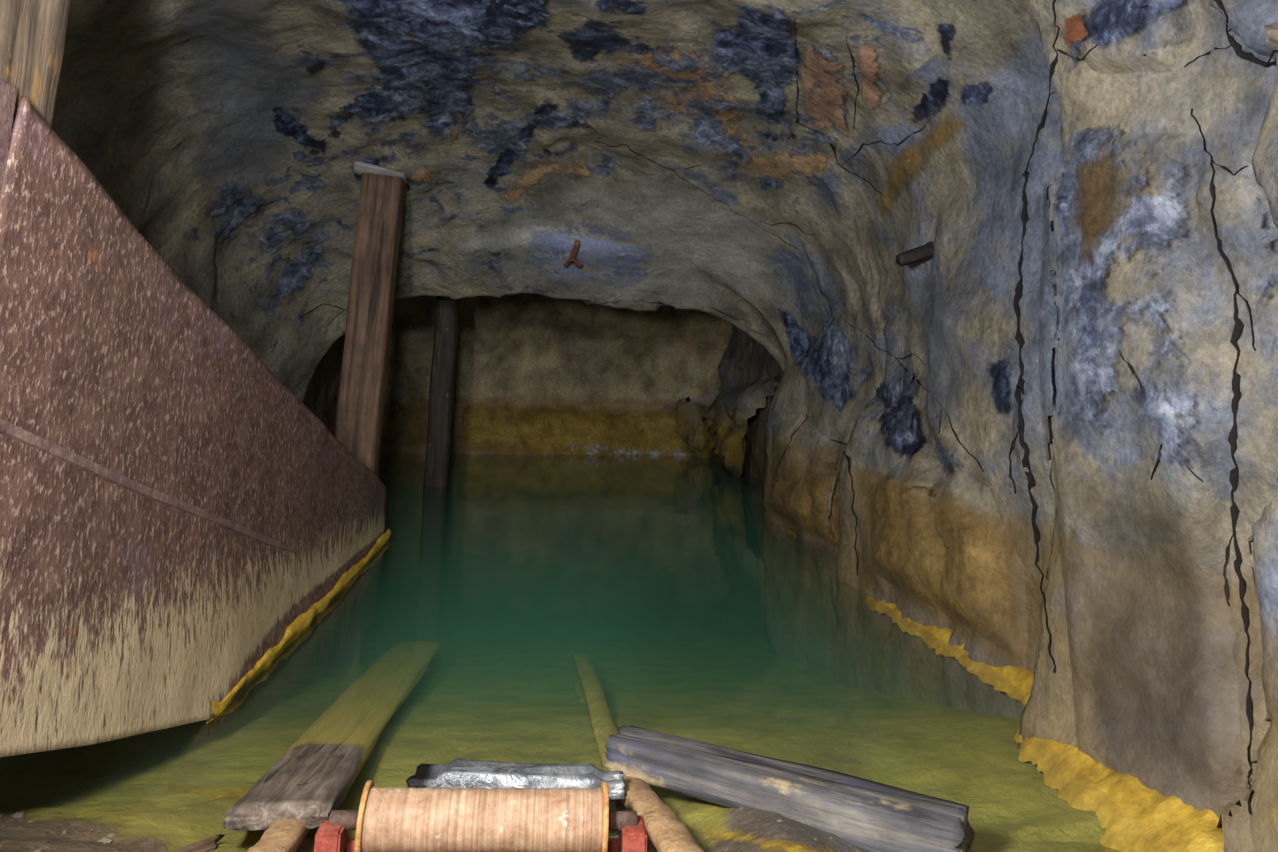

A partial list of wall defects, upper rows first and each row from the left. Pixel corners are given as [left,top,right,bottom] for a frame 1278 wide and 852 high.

crack [847,0,1098,673]
damp [1013,727,1224,852]
crack [1117,347,1145,393]
crack [1150,109,1256,814]